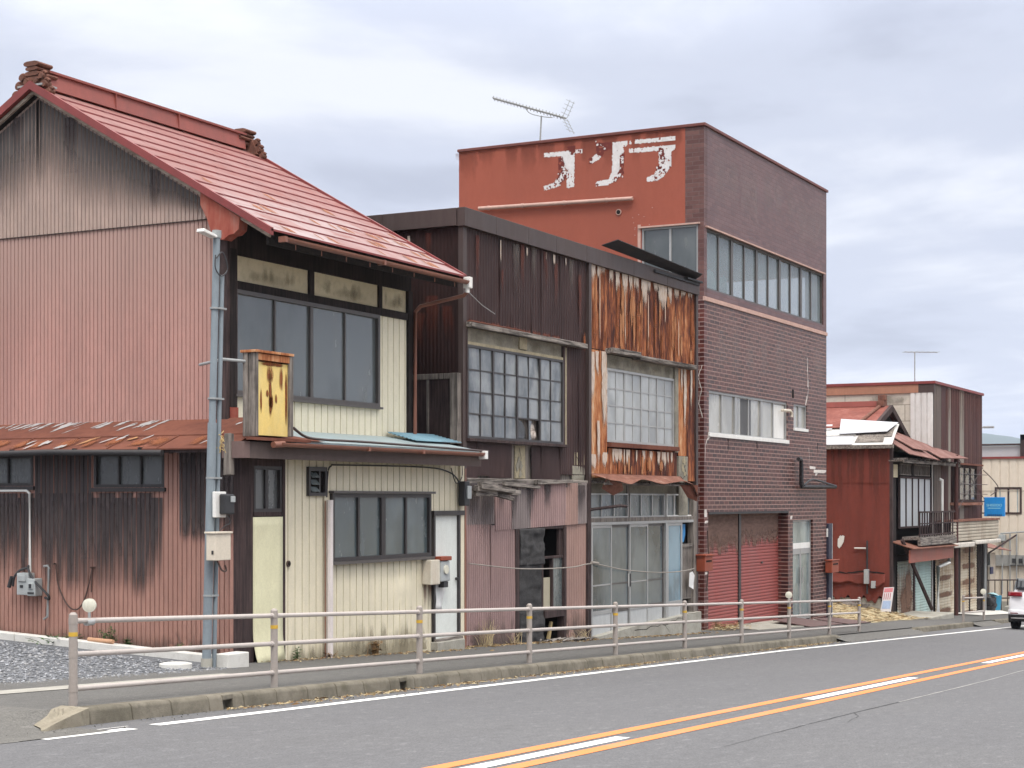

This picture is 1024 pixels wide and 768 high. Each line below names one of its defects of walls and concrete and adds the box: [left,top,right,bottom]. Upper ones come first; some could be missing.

damp [0,99,201,208]
peeling [549,141,625,189]
peeling [650,147,671,182]
rust [583,278,694,362]
rust [0,437,168,448]
damp [220,453,233,494]
rust [612,449,673,475]
damp [179,452,207,538]
damp [470,483,551,515]
damp [0,455,163,590]
rust [708,513,778,555]